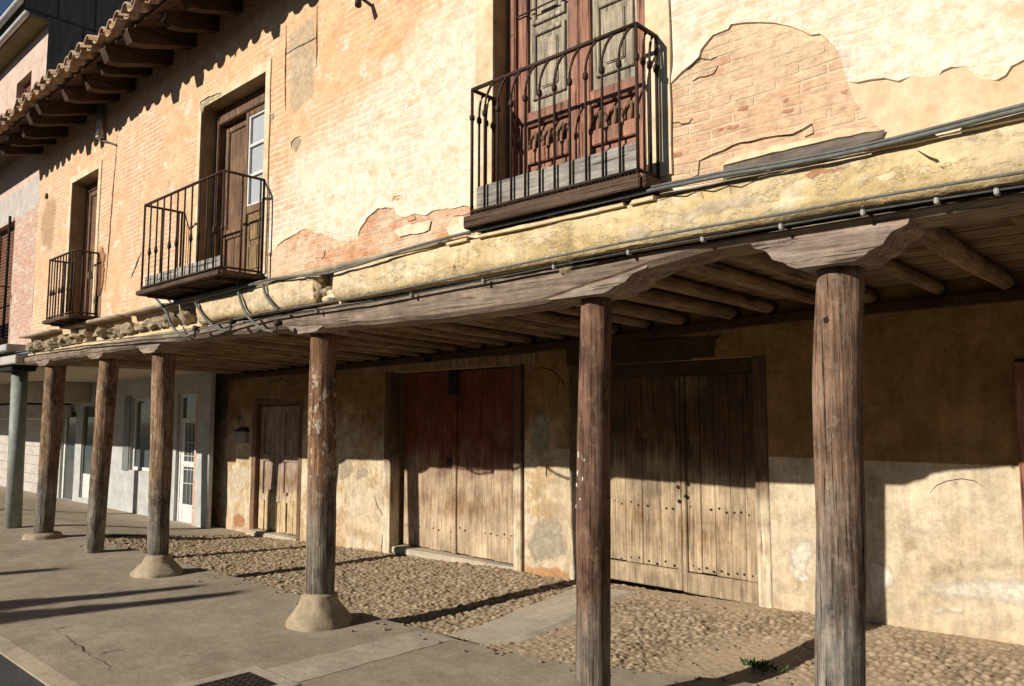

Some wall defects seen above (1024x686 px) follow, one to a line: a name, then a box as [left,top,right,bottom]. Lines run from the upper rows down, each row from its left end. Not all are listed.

flaking render [660,6,1024,186]
flaking render [266,193,475,279]